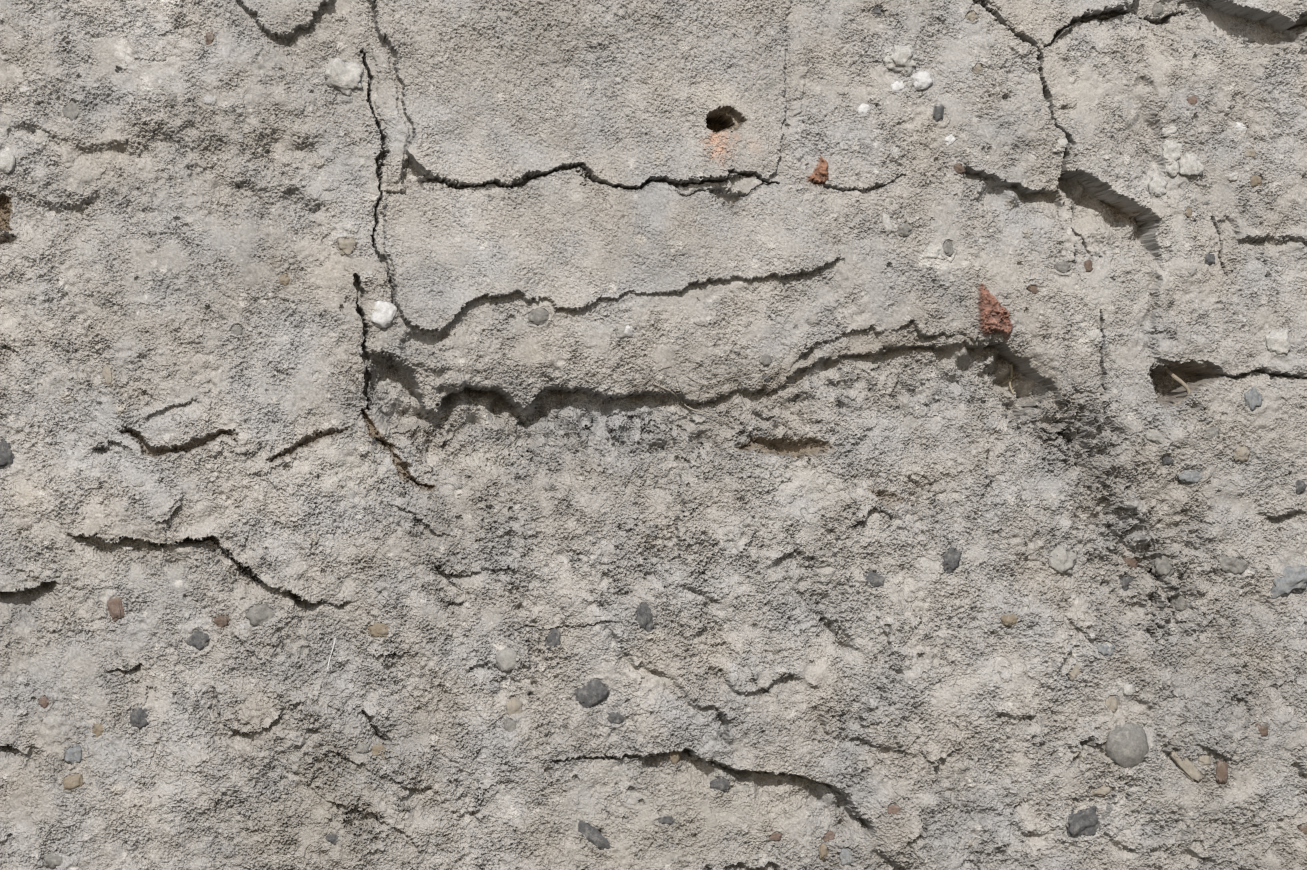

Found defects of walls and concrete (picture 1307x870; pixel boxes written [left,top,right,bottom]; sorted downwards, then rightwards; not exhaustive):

crack [972,0,1188,193]
crack [115,52,436,491]
crack [423,163,781,198]
spalling [0,0,1307,432]
crack [823,174,907,196]
crack [1071,227,1103,259]
crack [1210,216,1229,276]
crack [1099,310,1109,392]
crack [1214,368,1307,381]
crack [0,580,62,604]
crack [67,531,354,611]
crack [543,748,876,843]